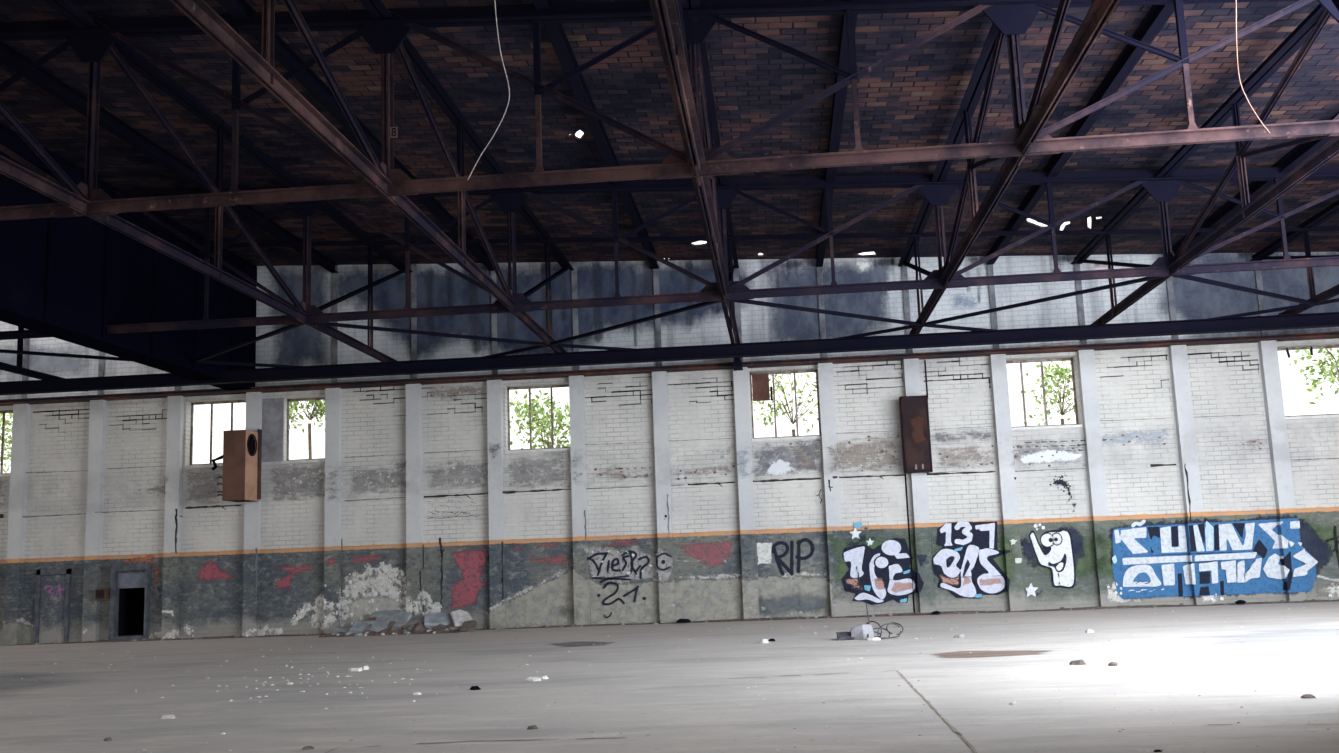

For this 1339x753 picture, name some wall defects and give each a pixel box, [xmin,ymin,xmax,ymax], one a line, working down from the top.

damp [272,261,728,366]
damp [769,260,892,341]
damp [1161,252,1339,336]
peeling [243,562,442,637]
crack [891,670,978,753]